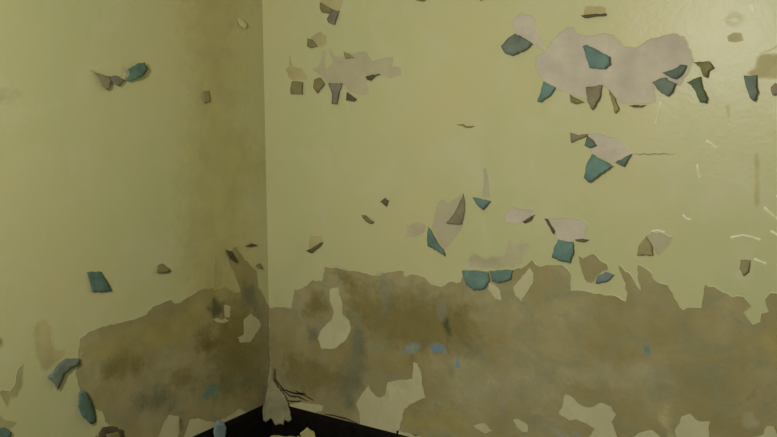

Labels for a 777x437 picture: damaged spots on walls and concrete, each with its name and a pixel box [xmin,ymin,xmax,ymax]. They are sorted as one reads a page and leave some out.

peeling [320,0,344,25]
peeling [88,62,148,90]
peeling [286,31,403,104]
peeling [501,12,713,113]
peeling [744,55,777,102]
peeling [570,132,632,182]
peeling [406,168,491,256]
peeling [35,217,777,437]
crack [275,379,314,402]